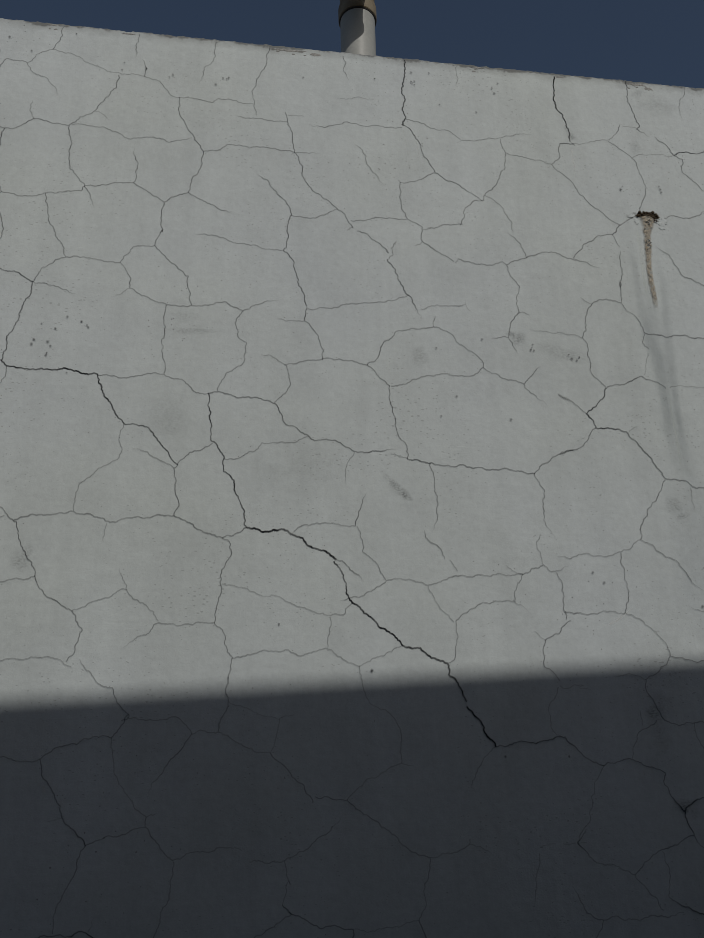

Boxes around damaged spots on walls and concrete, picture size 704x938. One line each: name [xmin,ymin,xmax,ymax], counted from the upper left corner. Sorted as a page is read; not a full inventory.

crack [401,60,493,197]
crack [553,77,571,142]
corrosion [642,215,657,300]
crack [1,334,177,464]
crack [208,376,704,850]